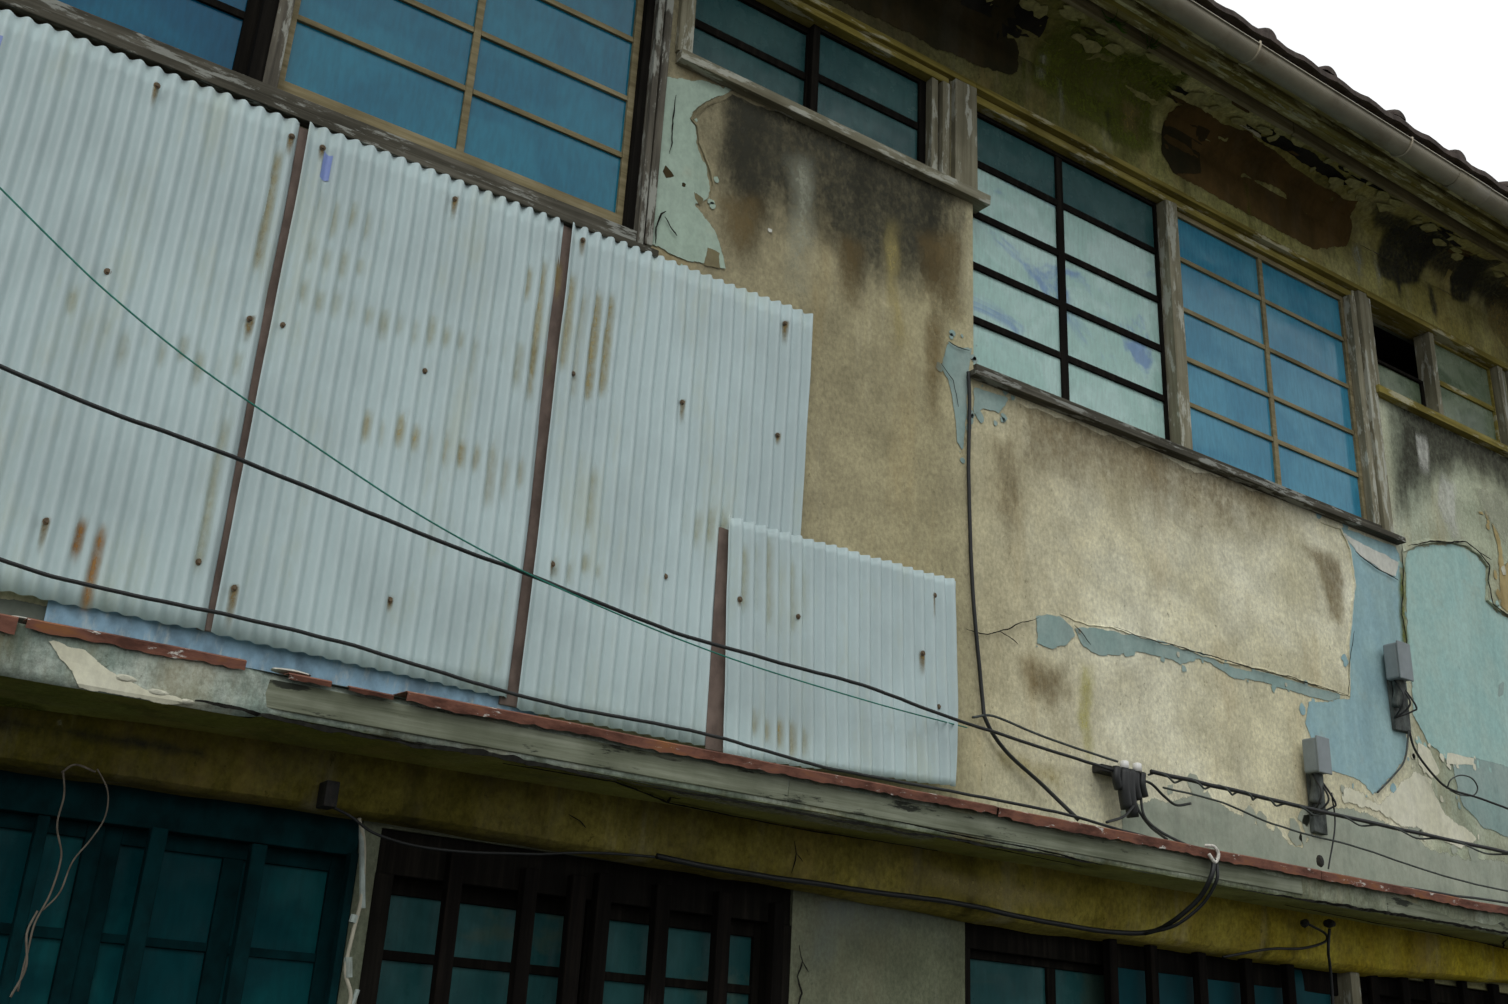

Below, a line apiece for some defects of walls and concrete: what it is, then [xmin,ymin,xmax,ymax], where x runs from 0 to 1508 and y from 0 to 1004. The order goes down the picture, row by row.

spalling [837,0,1125,75]
peeling [652,77,738,269]
leakage [727,94,955,291]
spalling [1144,53,1404,250]
leakage [1354,211,1508,314]
flaking render [1413,216,1472,261]
corrosion [73,524,103,604]
corrosion [229,587,238,609]
spalling [49,640,195,705]
peeling [1036,510,1508,907]